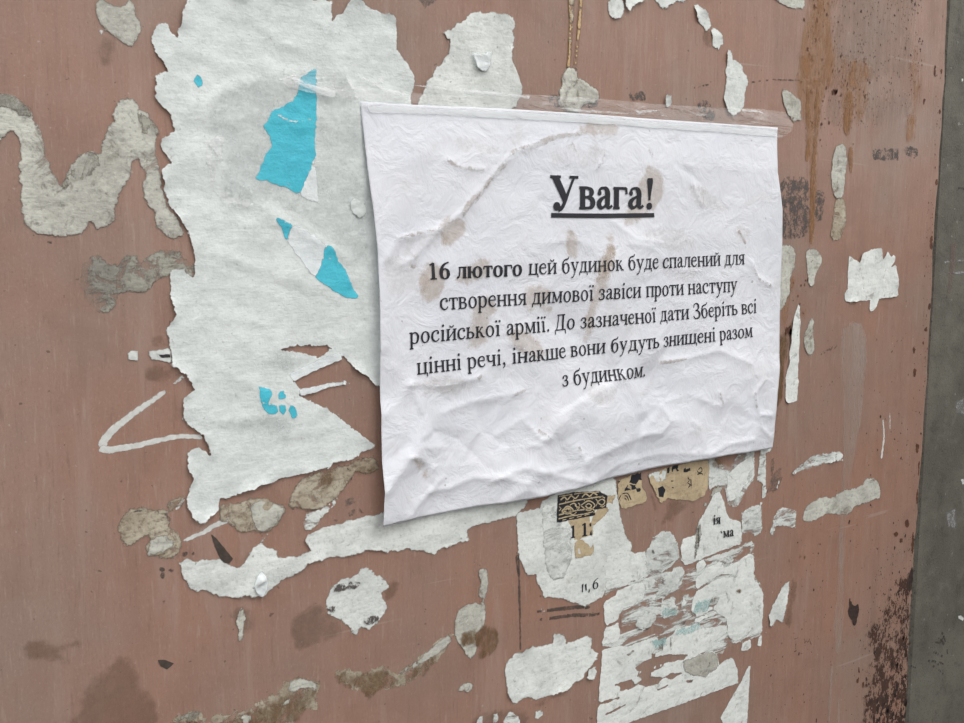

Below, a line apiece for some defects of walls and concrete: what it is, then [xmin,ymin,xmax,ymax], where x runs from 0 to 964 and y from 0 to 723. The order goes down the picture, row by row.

corrosion [799,0,866,244]
corrosion [848,510,914,723]